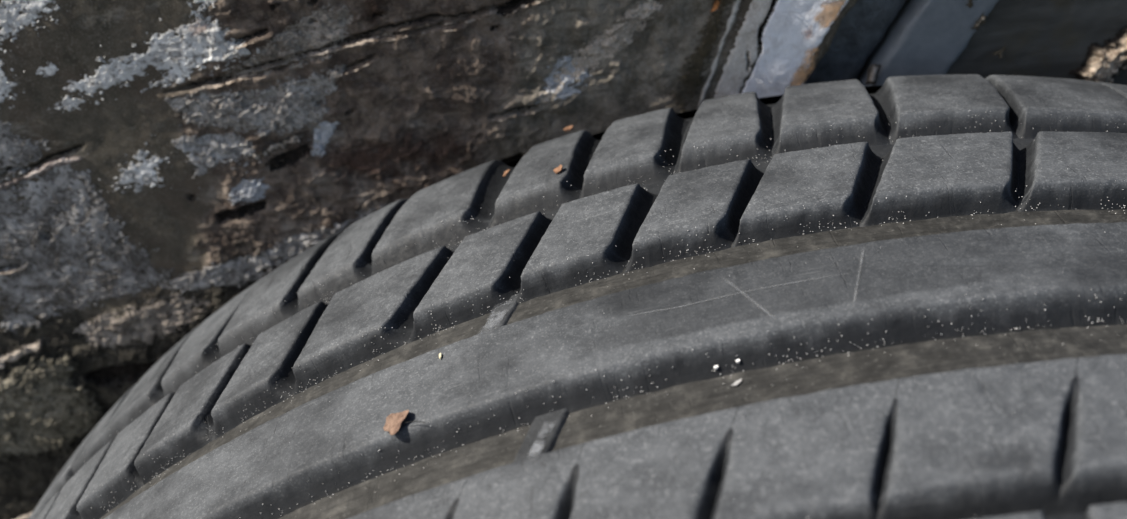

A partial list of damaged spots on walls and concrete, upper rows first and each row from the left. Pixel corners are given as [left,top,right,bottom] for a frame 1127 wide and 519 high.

spalling [1068,26,1127,83]